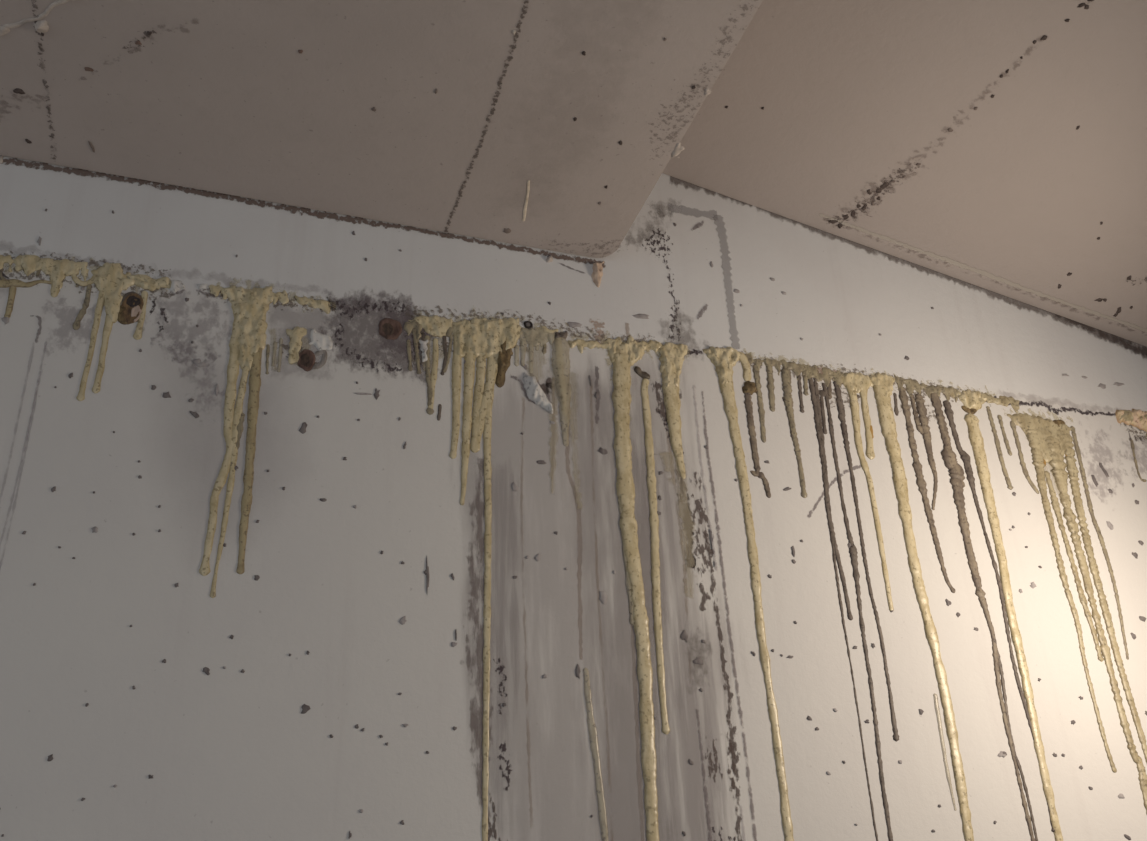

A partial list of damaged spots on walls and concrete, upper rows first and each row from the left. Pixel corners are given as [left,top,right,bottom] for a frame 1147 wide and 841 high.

damp [0,265,60,318]
damp [71,273,116,401]
damp [199,312,296,598]
damp [322,293,572,841]
damp [595,352,743,841]
damp [715,351,1147,841]
damp [583,667,609,841]